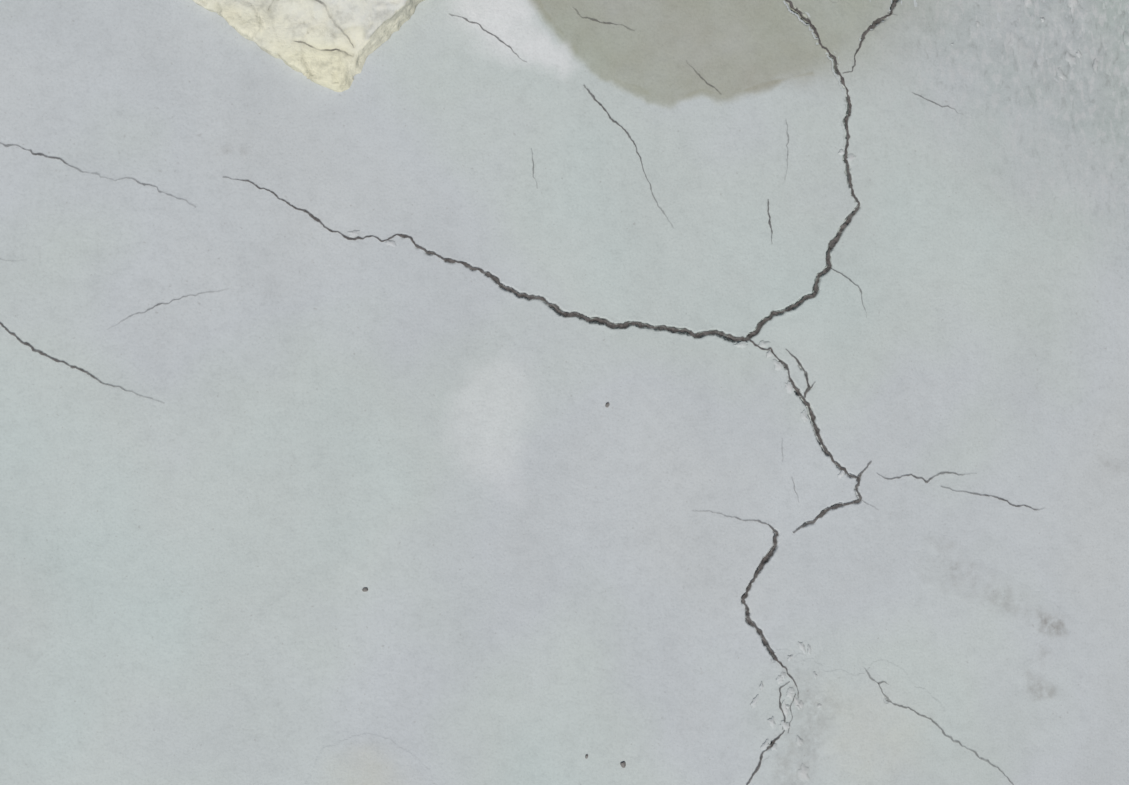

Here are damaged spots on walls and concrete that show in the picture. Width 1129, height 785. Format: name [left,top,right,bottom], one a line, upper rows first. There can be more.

leakage [432,0,881,114]
crack [31,151,67,164]
crack [0,323,112,386]
crack [234,0,1036,785]